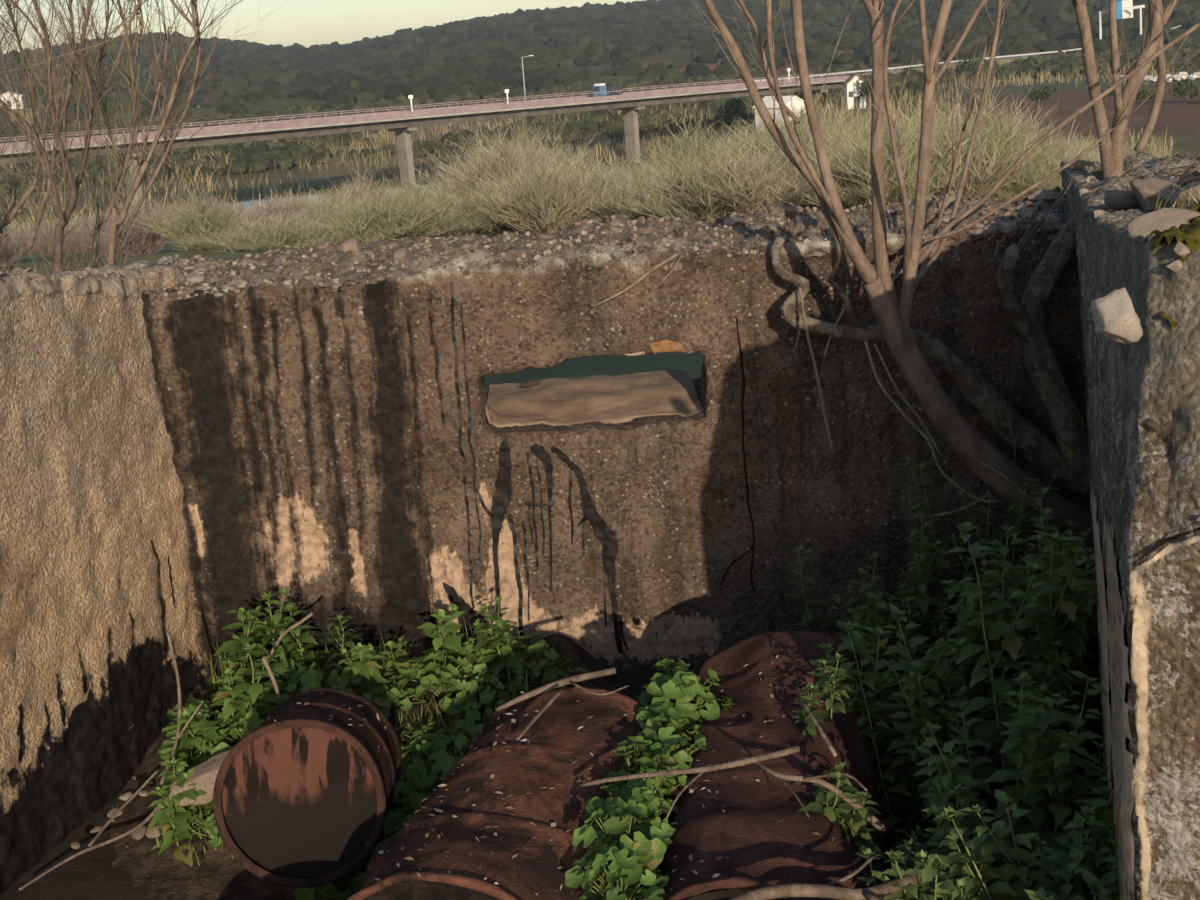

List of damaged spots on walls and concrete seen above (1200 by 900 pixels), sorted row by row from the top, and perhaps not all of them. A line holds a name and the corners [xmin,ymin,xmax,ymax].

water stain [142,277,437,674]
water stain [429,282,491,608]
water stain [508,452,586,636]
crack [720,318,755,589]
crack [1134,527,1200,563]
water stain [17,704,25,766]
water stain [44,674,68,746]
spalling [1089,480,1200,900]